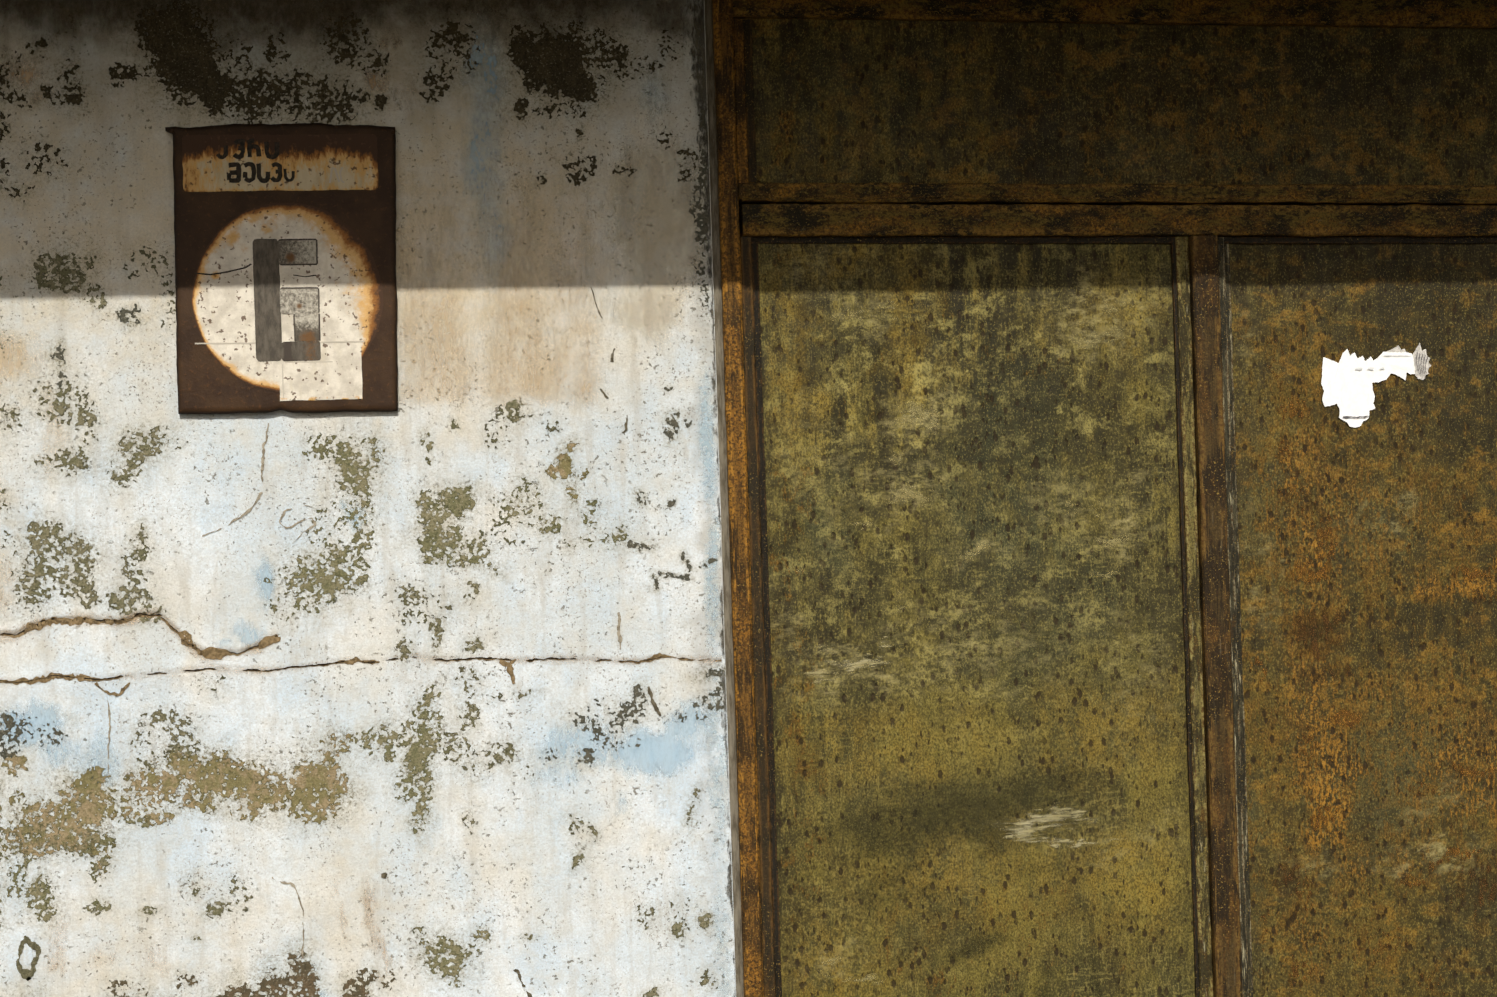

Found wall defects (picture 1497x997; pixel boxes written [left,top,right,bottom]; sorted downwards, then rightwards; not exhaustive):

flaking render [108,0,241,117]
flaking render [506,20,685,120]
spalling [545,441,591,503]
crack [0,612,722,777]
flaking render [0,733,354,877]
spalling [16,935,41,981]
flaking render [106,980,148,997]